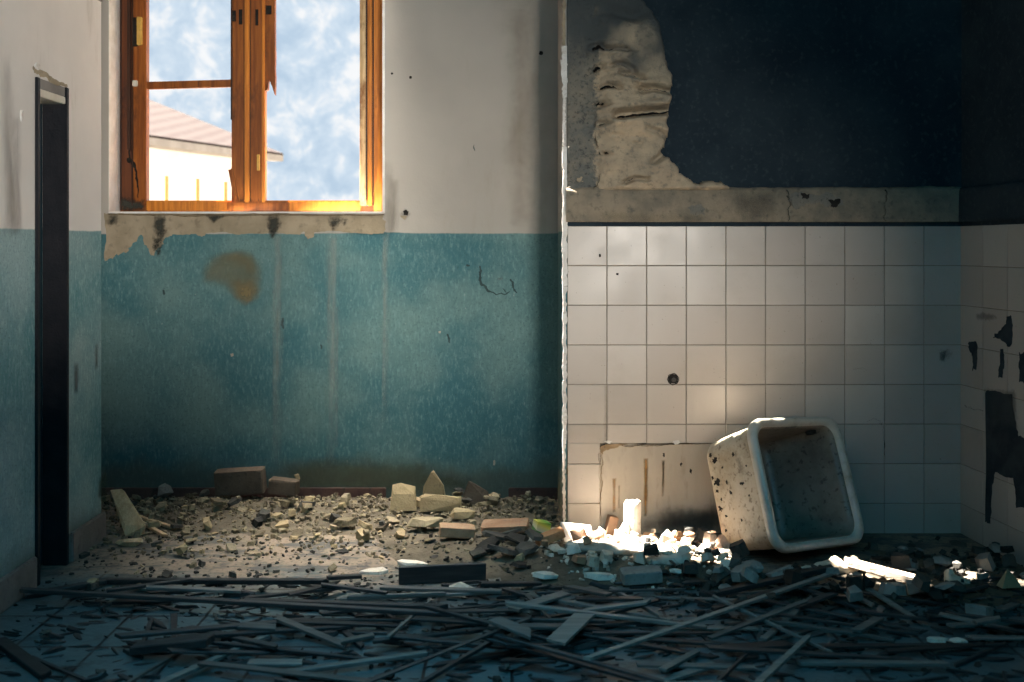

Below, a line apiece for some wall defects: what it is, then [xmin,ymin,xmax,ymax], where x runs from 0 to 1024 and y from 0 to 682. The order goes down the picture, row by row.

peeling [104,213,386,261]
crack [478,266,517,295]
spalling [968,341,978,371]
spalling [993,315,1024,383]
peeling [598,440,721,533]
spalling [985,390,1024,524]